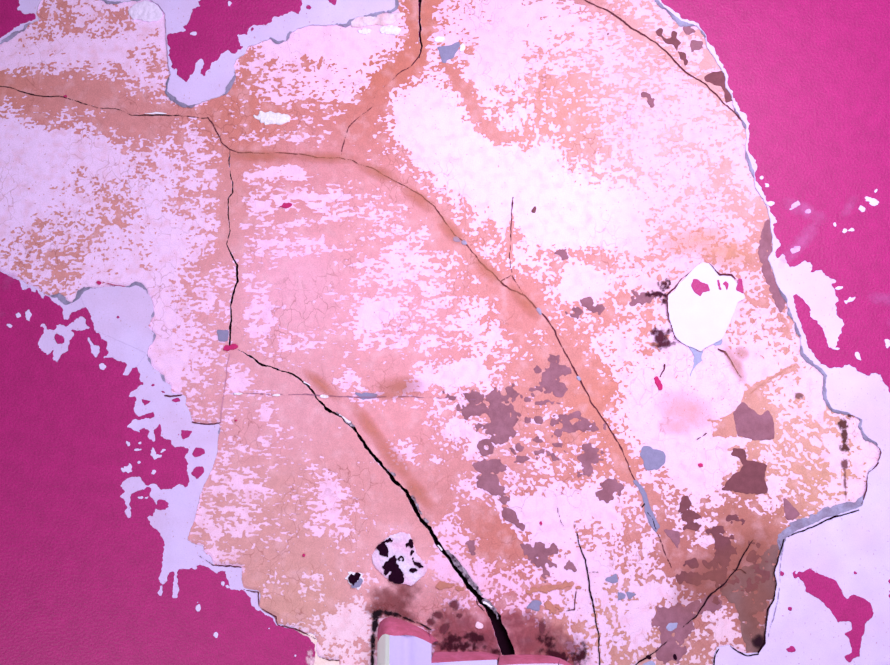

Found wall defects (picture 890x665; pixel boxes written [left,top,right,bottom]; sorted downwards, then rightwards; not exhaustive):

crack [585,0,742,121]
peeling [38,316,90,362]
peeling [100,333,146,375]
crack [0,86,672,568]
damp [646,278,671,304]
damp [651,328,676,349]
crack [663,263,736,343]
peeling [691,279,710,296]
crack [192,354,513,661]
damp [370,538,501,665]
peeling [380,540,504,665]
damp [538,622,587,665]